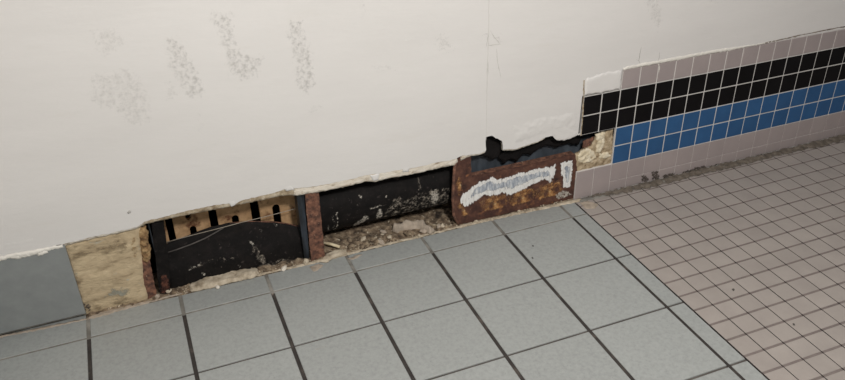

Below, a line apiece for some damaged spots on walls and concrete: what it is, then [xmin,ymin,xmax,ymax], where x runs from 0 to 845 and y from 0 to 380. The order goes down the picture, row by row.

spalling [501,126,577,151]
peeling [574,129,613,171]
corrosion [485,182,561,210]
peeling [0,152,485,315]